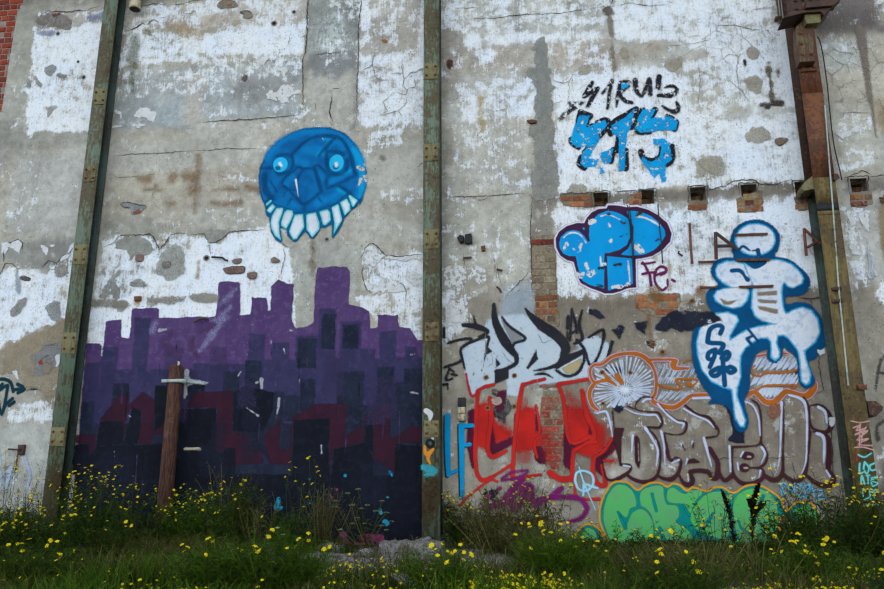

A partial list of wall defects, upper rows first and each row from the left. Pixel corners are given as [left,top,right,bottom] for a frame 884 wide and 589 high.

crack [127,0,198,31]
spalling [217,0,253,18]
crack [208,0,424,129]
corrosion [765,61,779,101]
crack [823,43,884,137]
flaking render [687,185,708,211]
flaking render [736,182,764,213]
flaking render [792,180,808,211]
peeling [847,175,873,231]
flaking render [530,235,583,327]
peeling [574,262,607,279]
spalling [0,297,65,397]